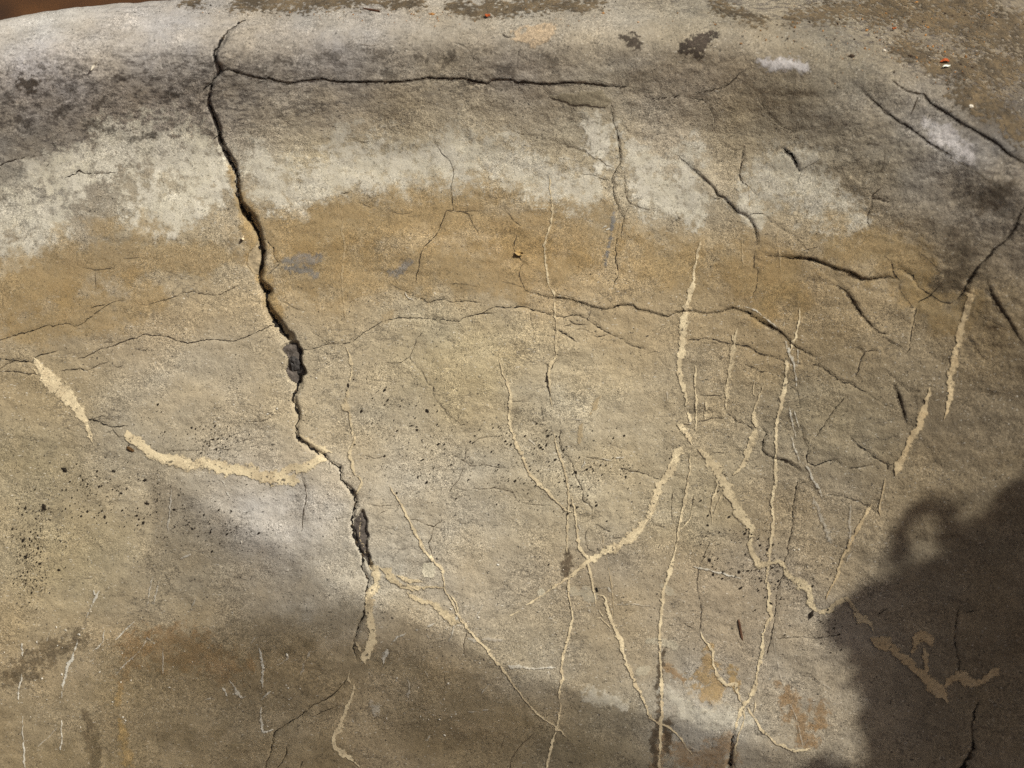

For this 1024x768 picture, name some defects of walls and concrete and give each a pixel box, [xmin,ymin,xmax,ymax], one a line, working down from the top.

water stain [757,57,809,73]
water stain [0,107,709,319]
crack [0,20,745,378]
water stain [736,146,871,240]
crack [826,75,1024,189]
water stain [923,120,975,161]
crack [200,109,1024,657]
crack [960,702,979,768]